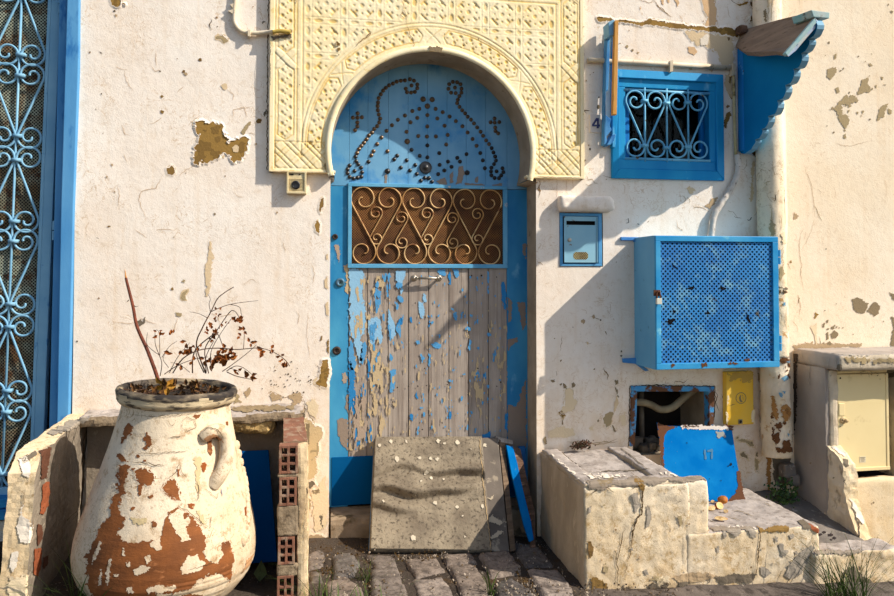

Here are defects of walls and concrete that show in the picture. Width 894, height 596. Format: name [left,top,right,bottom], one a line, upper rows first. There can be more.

peeling [594,0,740,128]
peeling [825,54,892,139]
spalling [164,109,267,177]
peeling [852,297,894,346]
spalling [551,380,580,425]
spalling [597,380,619,432]
spalling [304,417,327,538]
spalling [552,454,706,509]
crack [562,379,724,587]